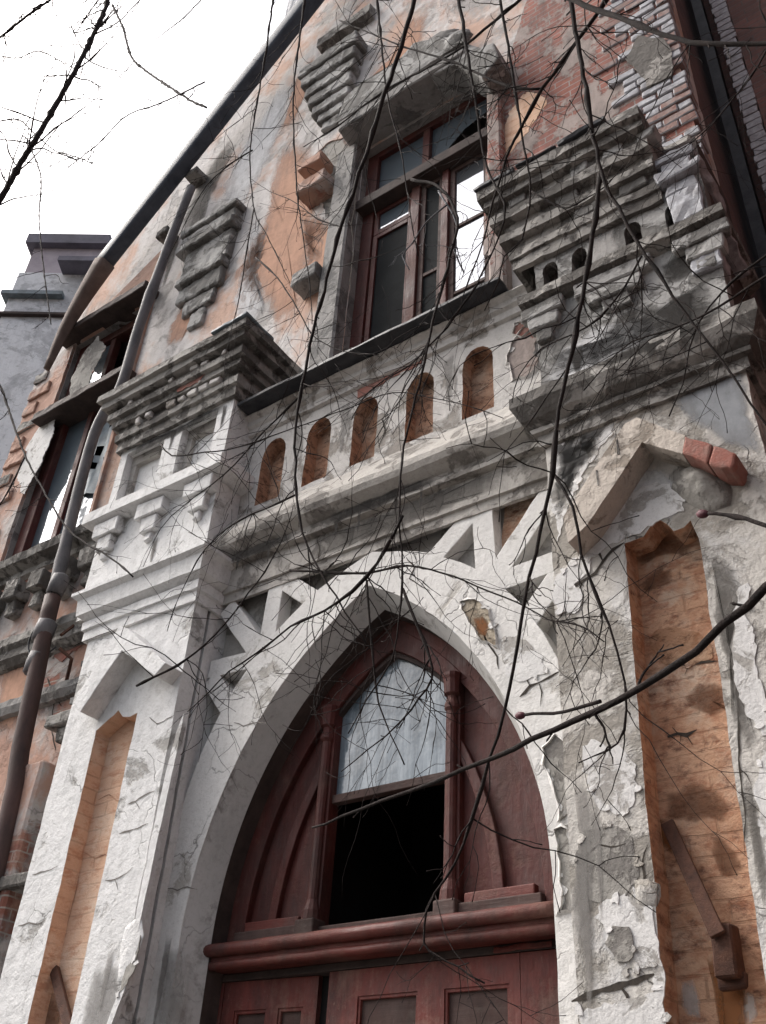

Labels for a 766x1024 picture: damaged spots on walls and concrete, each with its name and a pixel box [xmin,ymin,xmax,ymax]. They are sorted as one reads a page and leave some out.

spalling [505,91,547,154]
peeling [218,78,349,317]
peeling [549,420,619,542]
flaking render [683,437,748,486]
peeling [552,471,685,616]
peeling [459,597,549,682]
peeling [732,583,766,736]
crack [84,791,154,889]
peeling [540,734,657,977]
damp [670,787,722,820]
damp [715,838,739,875]
peeling [753,750,766,844]